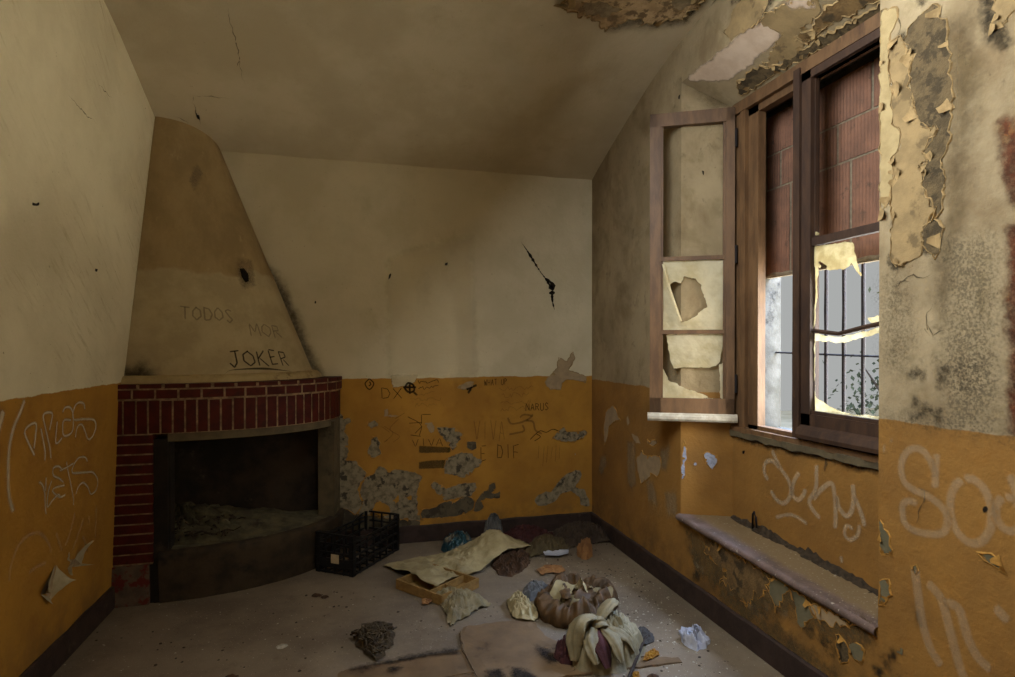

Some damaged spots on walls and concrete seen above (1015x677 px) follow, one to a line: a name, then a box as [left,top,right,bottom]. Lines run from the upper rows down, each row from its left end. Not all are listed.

spalling [554,0,705,32]
peeling [988,0,1015,36]
flaking render [723,0,956,268]
peeling [545,352,587,390]
peeling [339,408,501,531]
peeling [535,470,590,506]
peeling [552,427,587,442]
peeling [603,406,662,484]
peeling [680,440,718,479]